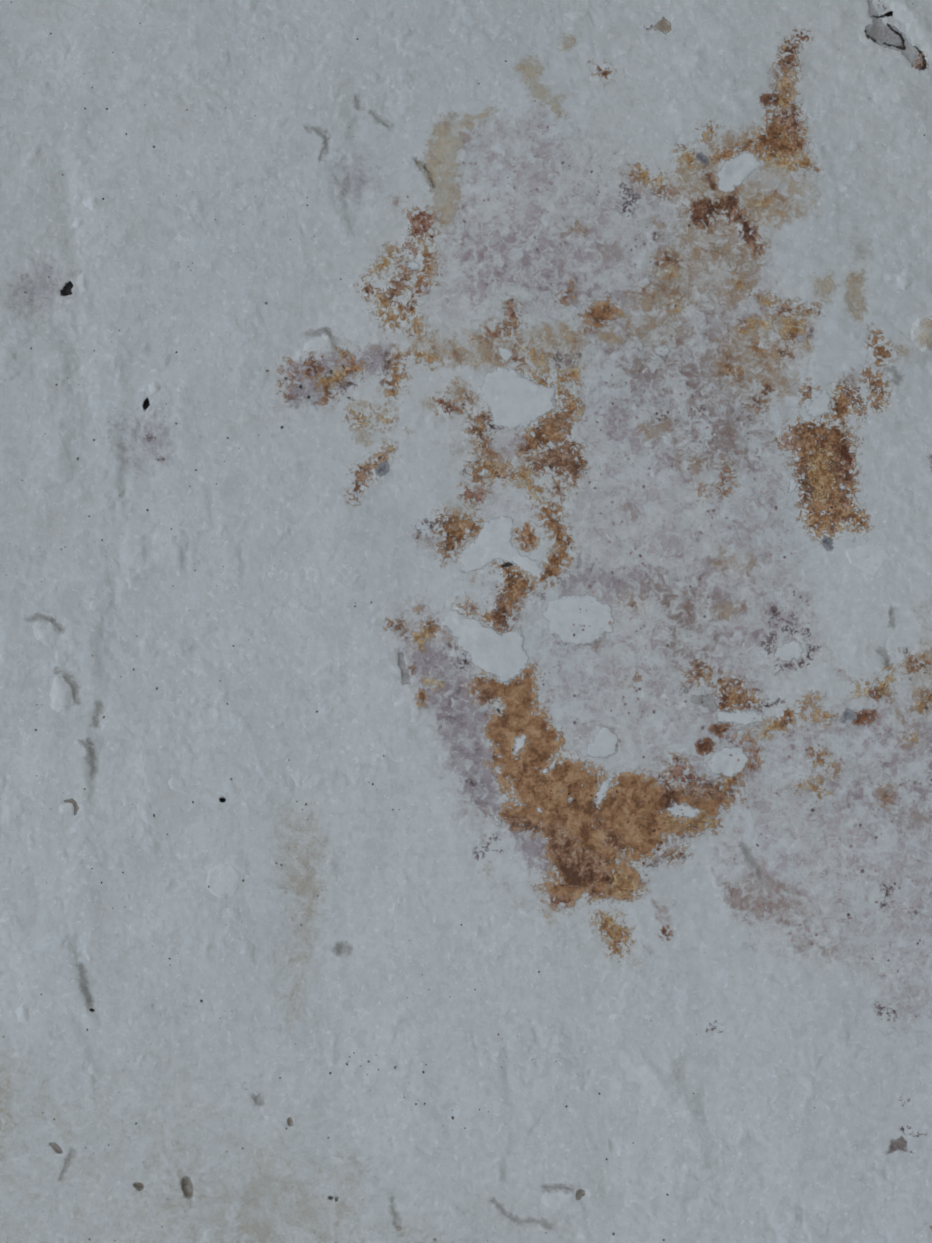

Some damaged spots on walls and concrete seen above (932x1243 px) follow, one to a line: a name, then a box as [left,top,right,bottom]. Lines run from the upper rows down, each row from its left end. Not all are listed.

spalling [864,0,928,70]
corrosion [278,205,629,634]
corrosion [628,29,892,551]
corrosion [385,604,452,650]
corrosion [408,665,445,709]
corrosion [464,648,932,958]